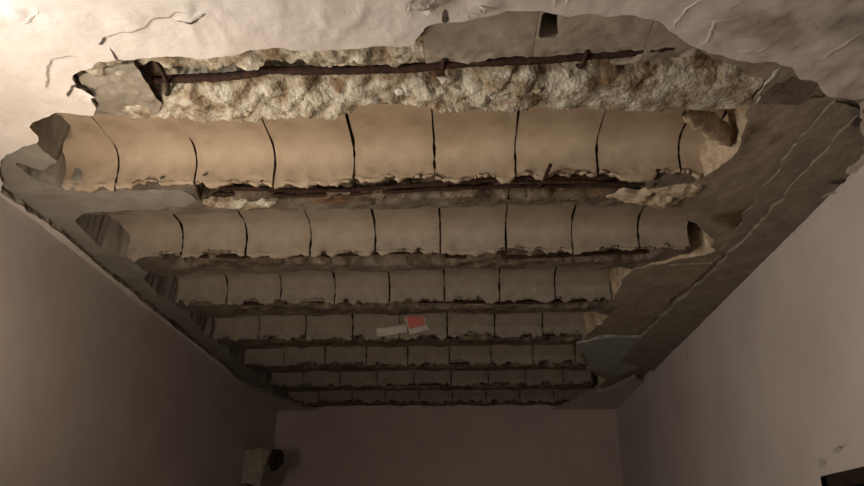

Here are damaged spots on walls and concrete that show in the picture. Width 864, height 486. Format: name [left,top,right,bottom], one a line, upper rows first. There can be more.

peeling [66,75,97,109]
peeling [406,0,451,15]
spalling [99,38,768,210]
peeling [0,100,864,411]